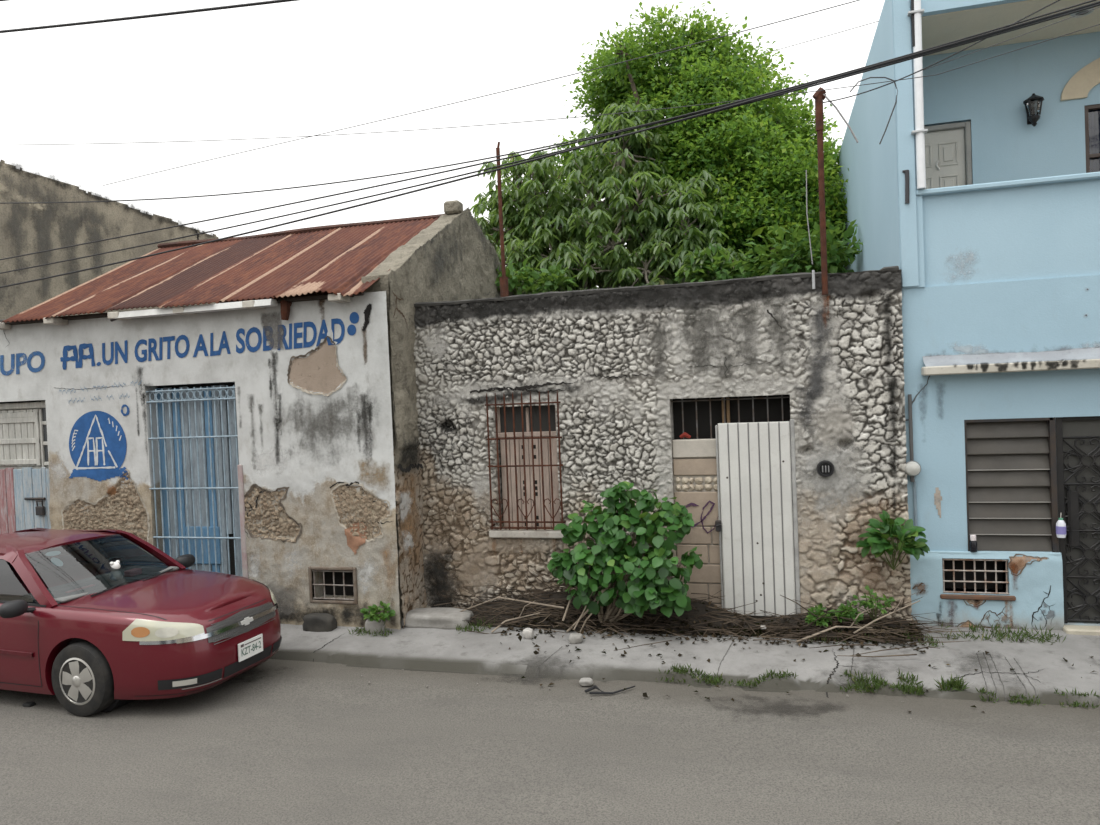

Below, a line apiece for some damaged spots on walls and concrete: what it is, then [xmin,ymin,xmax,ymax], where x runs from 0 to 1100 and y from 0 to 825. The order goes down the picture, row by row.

spalling [287,336,347,396]
damp [954,347,1085,372]
damp [269,353,281,461]
damp [294,395,372,448]
spalling [61,468,150,542]
spalling [244,484,302,543]
spalling [330,483,410,555]
peeling [1008,554,1049,580]
crack [979,585,1055,629]